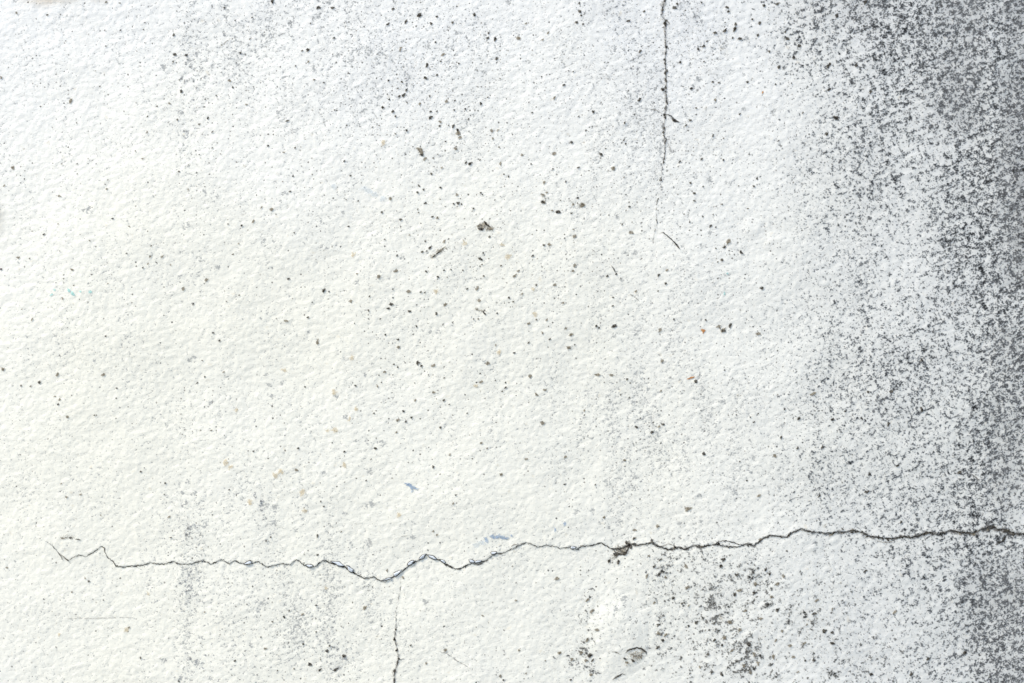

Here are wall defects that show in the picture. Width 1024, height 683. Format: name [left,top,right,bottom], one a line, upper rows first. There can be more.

crack [653,0,679,239]
crack [45,526,1024,683]